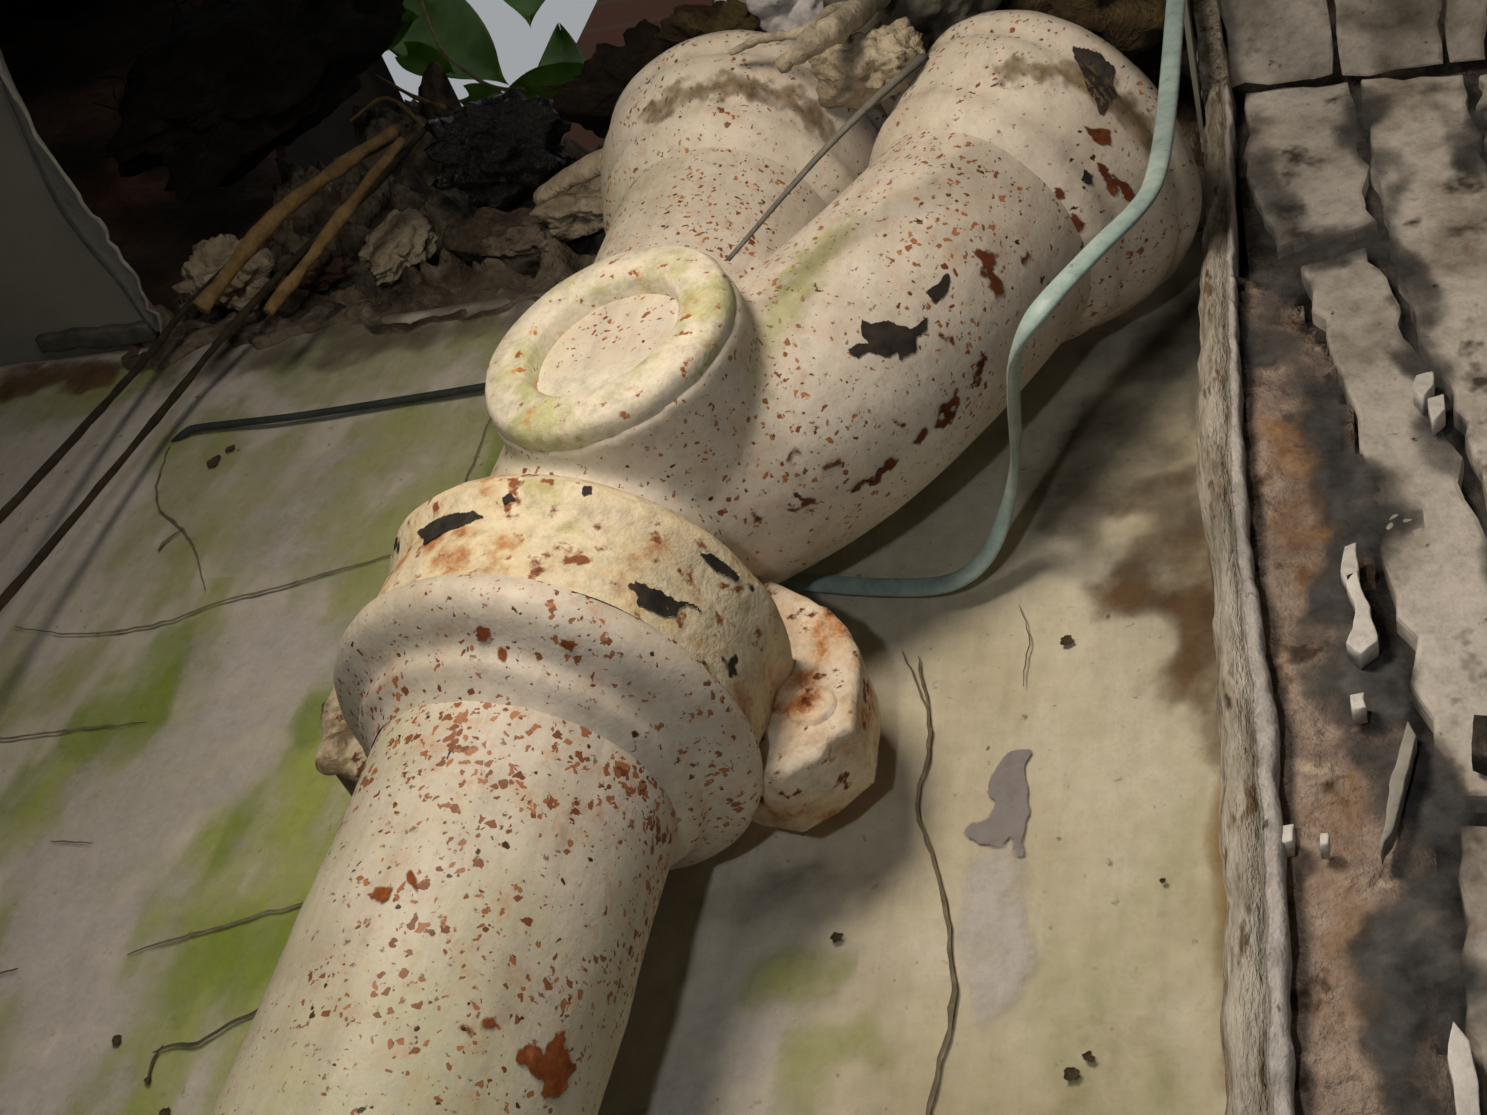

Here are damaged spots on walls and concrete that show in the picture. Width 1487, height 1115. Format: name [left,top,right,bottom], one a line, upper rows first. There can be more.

peeling [848,273,950,360]
corrosion [476,626,506,661]
corrosion [559,640,575,651]
leakage [1100,515,1216,712]
peeling [1237,273,1487,1115]
corrosion [371,870,417,902]
crack [902,651,957,1115]
leakage [1212,800,1228,925]
corrosion [459,1017,495,1033]
corrosion [516,1031,576,1099]